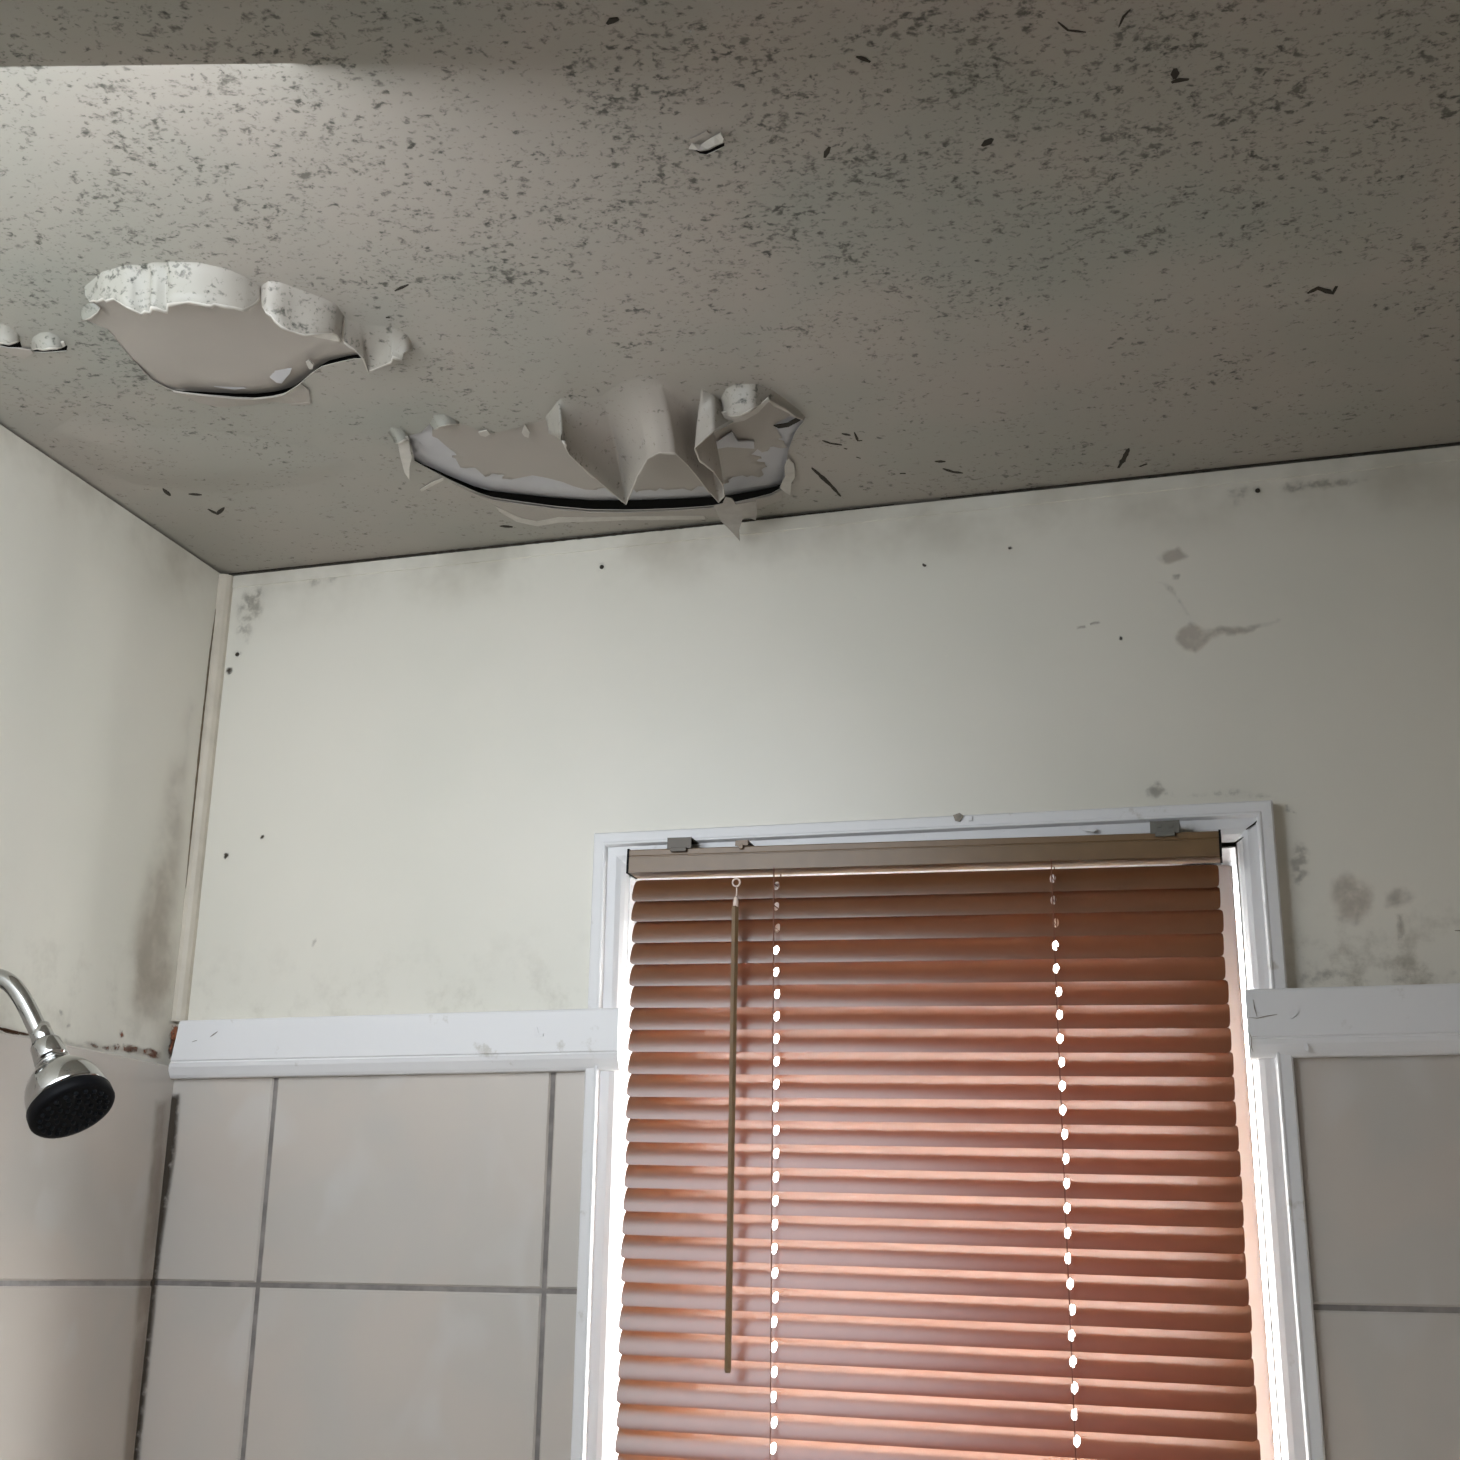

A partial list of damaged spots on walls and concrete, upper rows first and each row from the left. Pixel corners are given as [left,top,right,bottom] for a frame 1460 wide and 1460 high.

peeling [81,262,412,408]
peeling [388,377,805,541]